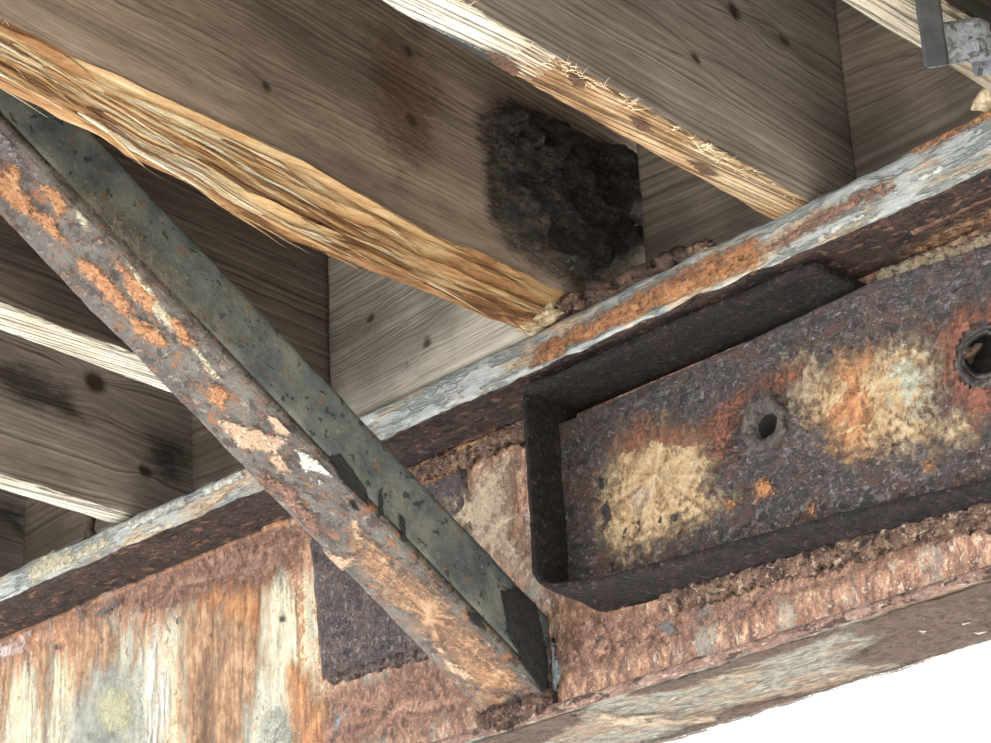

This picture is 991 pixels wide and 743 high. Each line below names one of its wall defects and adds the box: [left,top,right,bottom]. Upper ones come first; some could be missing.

corrosion [767,180,895,251]
corrosion [698,302,991,465]
peeling [598,422,723,551]
corrosion [754,476,775,503]
corrosion [0,655,10,743]
corrosion [29,469,325,743]
corrosion [286,535,520,743]
corrosion [475,583,991,743]
corrosion [553,530,973,682]